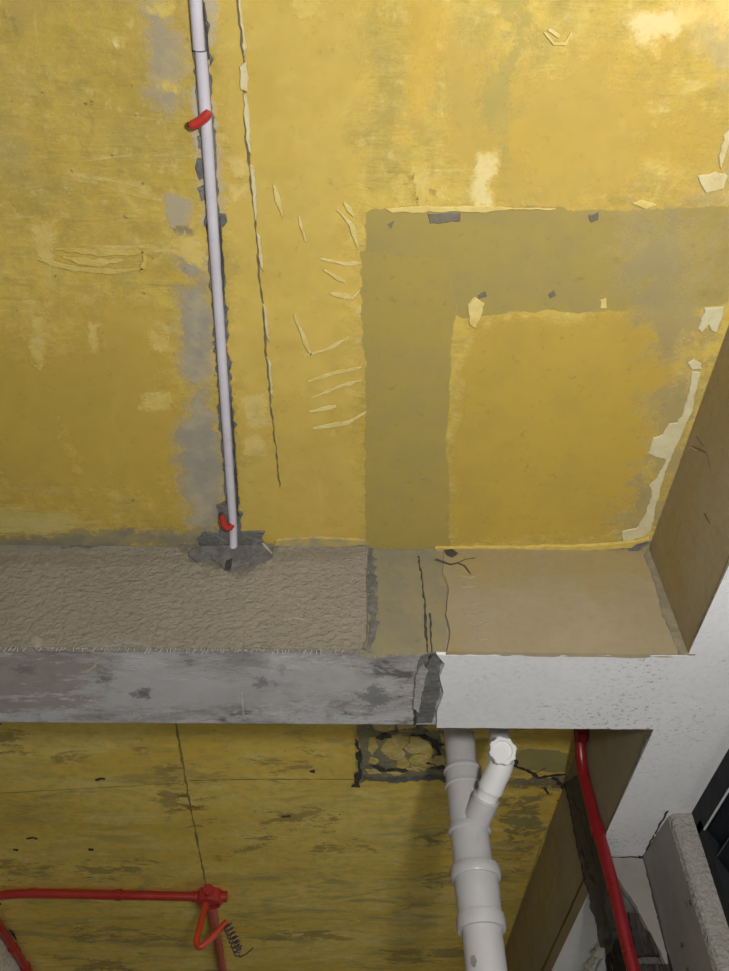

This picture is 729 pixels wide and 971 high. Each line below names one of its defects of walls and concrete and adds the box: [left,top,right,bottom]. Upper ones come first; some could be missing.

flaking render [698,129,729,193]
flaking render [698,306,724,332]
flaking render [622,359,702,551]
spalling [351,652,447,788]
leakage [151,764,216,828]
leakage [260,807,339,833]
leakage [44,925,186,971]